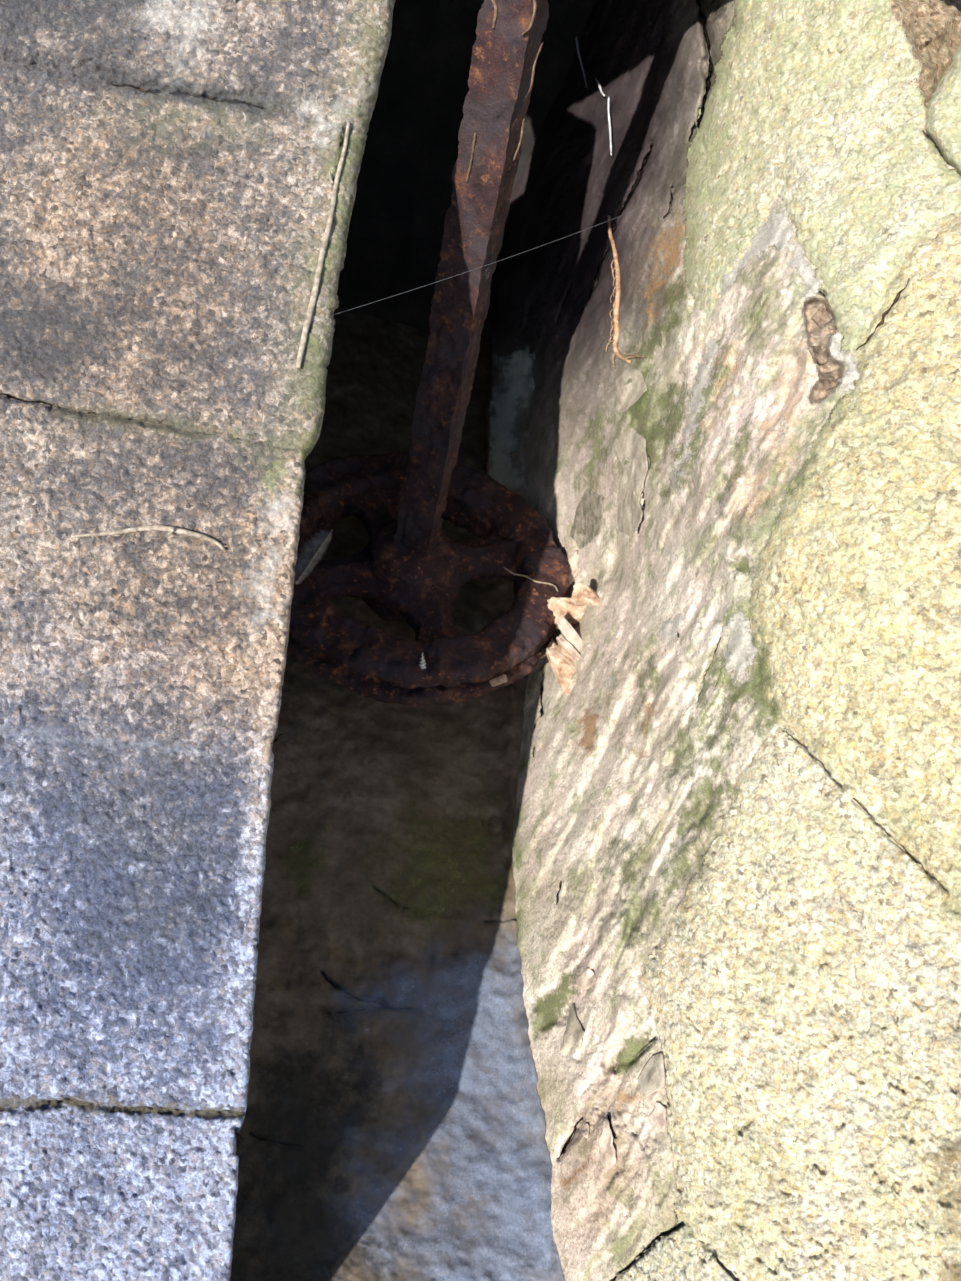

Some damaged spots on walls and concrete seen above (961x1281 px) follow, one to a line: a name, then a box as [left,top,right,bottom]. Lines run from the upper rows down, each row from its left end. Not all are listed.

crack [110,83,264,108]
spalling [802,295,844,403]
crack [3,393,162,424]
crack [782,731,949,893]
crack [38,1099,267,1141]